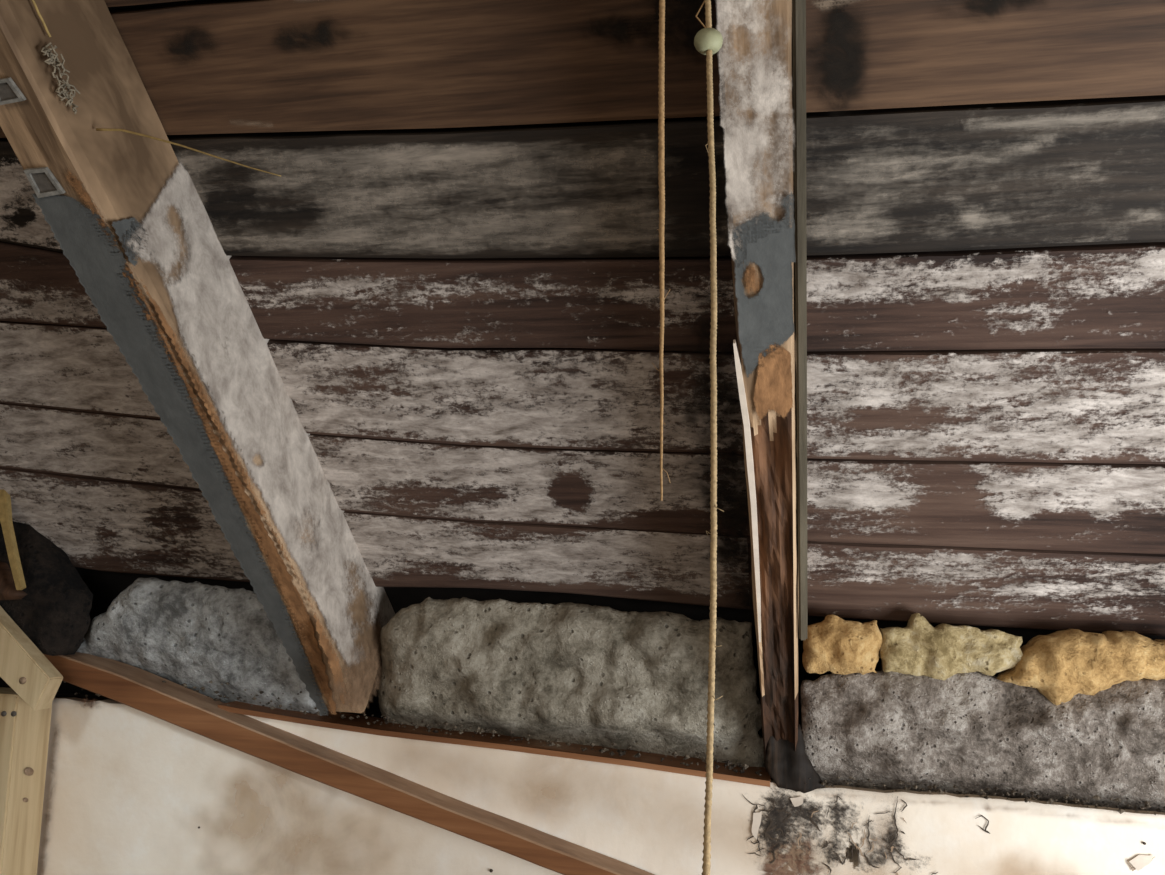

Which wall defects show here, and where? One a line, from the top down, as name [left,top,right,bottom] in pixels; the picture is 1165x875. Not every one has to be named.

damp [697,320,711,339]
damp [687,353,754,622]
damp [742,788,920,875]